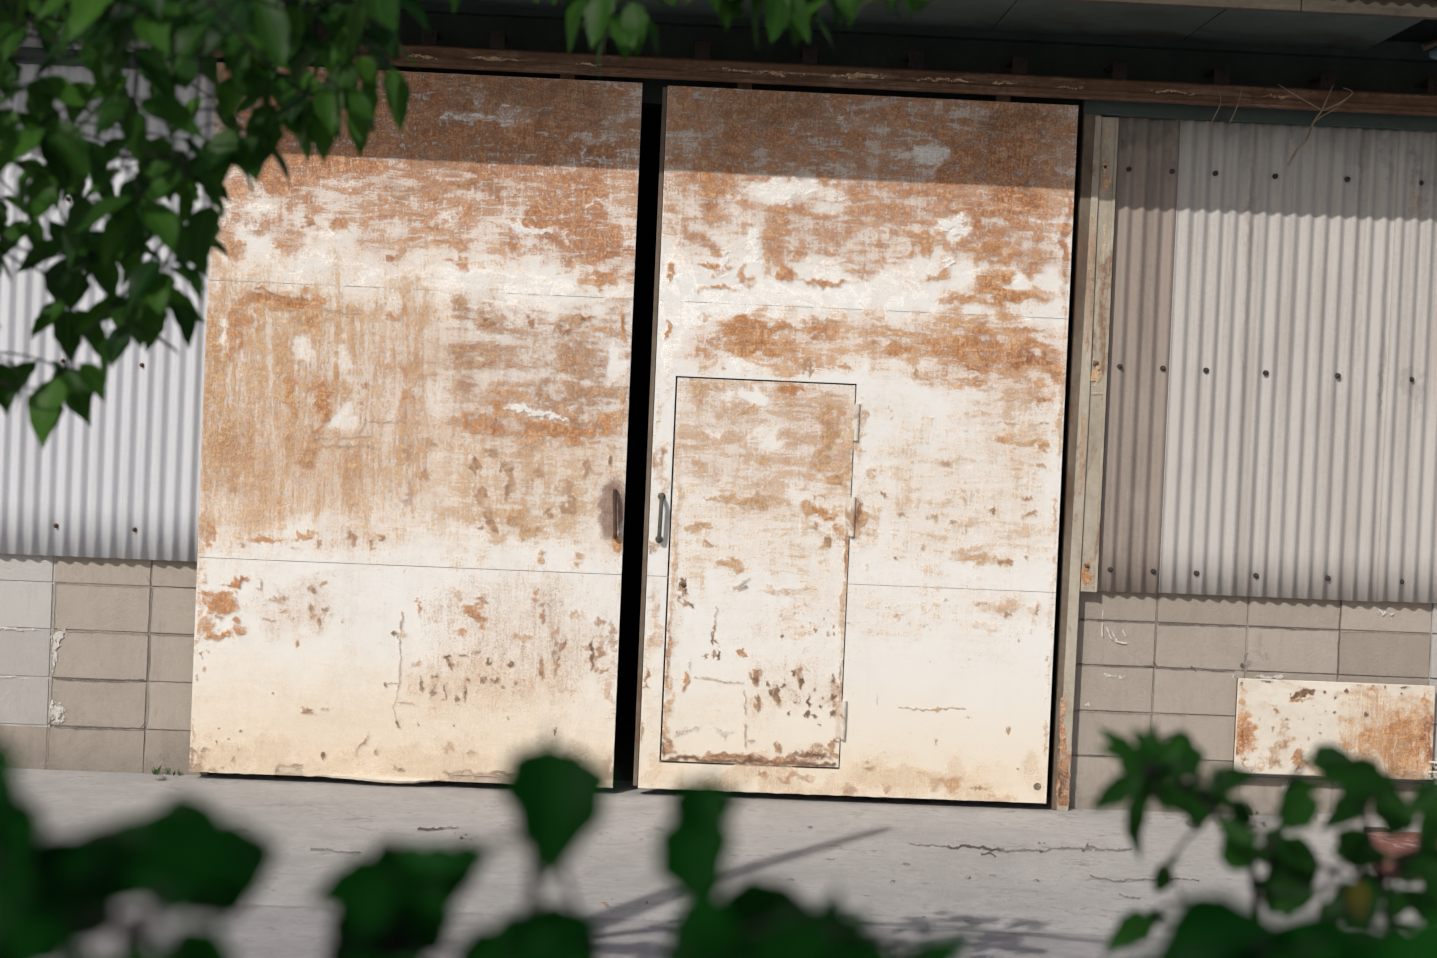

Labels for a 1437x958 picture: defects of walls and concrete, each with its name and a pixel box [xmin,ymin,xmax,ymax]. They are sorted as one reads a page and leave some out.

corrosion [217,63,231,80]
corrosion [307,67,329,82]
corrosion [189,70,642,782]
corrosion [644,86,1112,806]
crack [383,611,413,728]
corrosion [1236,685,1434,780]
crack [909,843,1199,899]